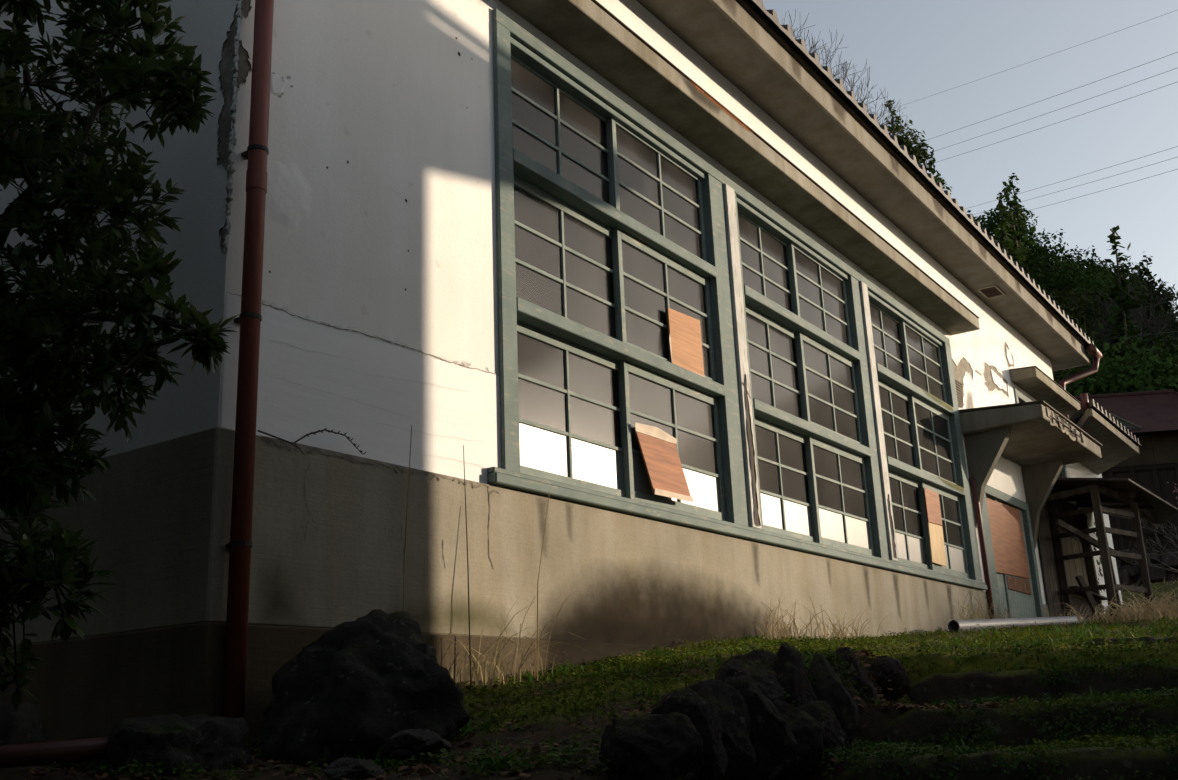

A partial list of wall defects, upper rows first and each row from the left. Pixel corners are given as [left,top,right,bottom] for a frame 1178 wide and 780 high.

flaking render [217,0,252,255]
crack [228,292,498,392]
flaking render [952,340,1014,410]
crack [372,421,500,569]